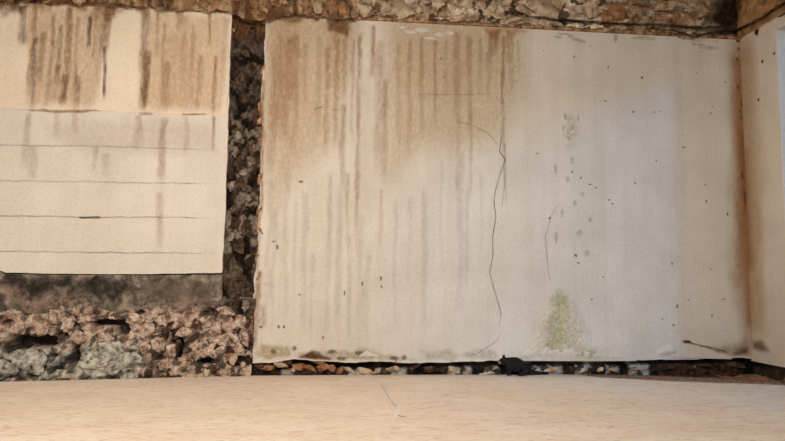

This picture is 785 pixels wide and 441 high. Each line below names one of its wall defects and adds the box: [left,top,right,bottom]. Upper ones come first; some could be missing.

water stain [278,16,354,154]
spalling [37,0,738,35]
spalling [0,15,508,382]
flaking render [524,291,755,378]